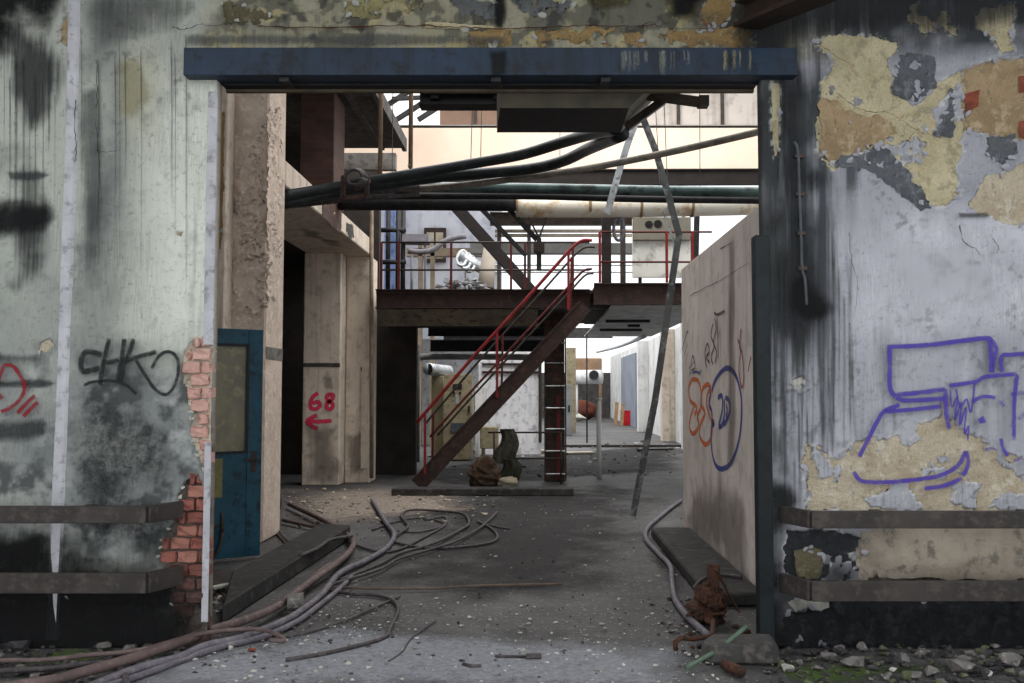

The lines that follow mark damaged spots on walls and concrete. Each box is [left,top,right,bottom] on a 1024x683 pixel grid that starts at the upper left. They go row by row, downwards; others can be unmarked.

peeling [220,0,287,25]
peeling [344,0,423,19]
peeling [425,0,512,48]
peeling [512,0,647,48]
peeling [659,0,750,48]
peeling [810,12,1024,229]
peeling [800,398,1024,511]
flaking render [156,336,217,647]
peeling [783,529,860,580]